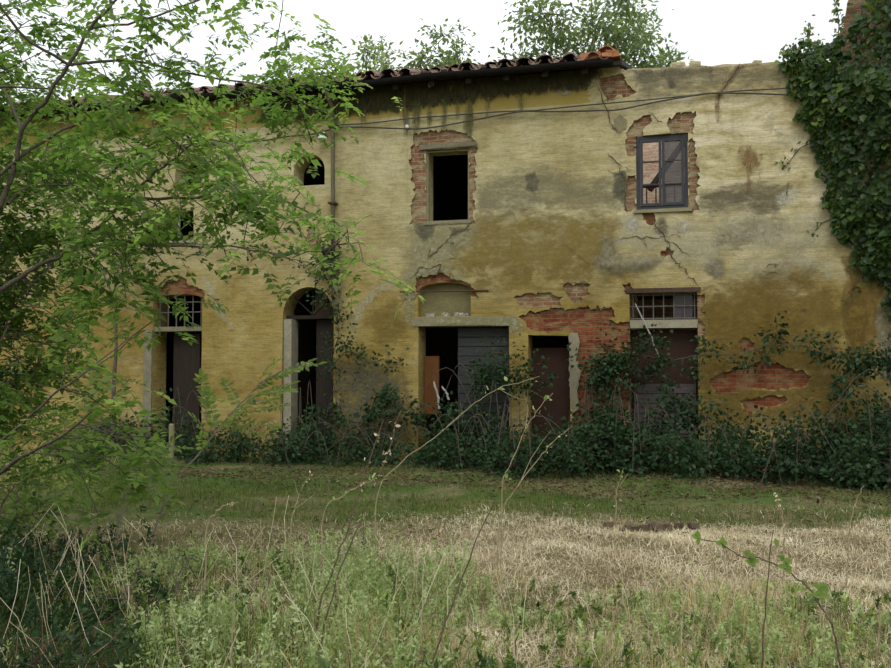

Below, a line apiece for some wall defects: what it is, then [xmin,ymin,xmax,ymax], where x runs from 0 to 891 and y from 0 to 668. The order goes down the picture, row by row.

leakage [260,68,602,135]
flaking render [557,74,636,102]
flaking render [409,130,478,226]
flaking render [625,115,652,157]
flaking render [624,176,656,225]
flaking render [667,112,700,214]
flaking render [401,271,478,300]
crack [414,225,470,277]
crack [622,221,699,287]
leakage [699,182,883,428]
flaking render [515,283,630,435]
flaking render [709,360,811,414]